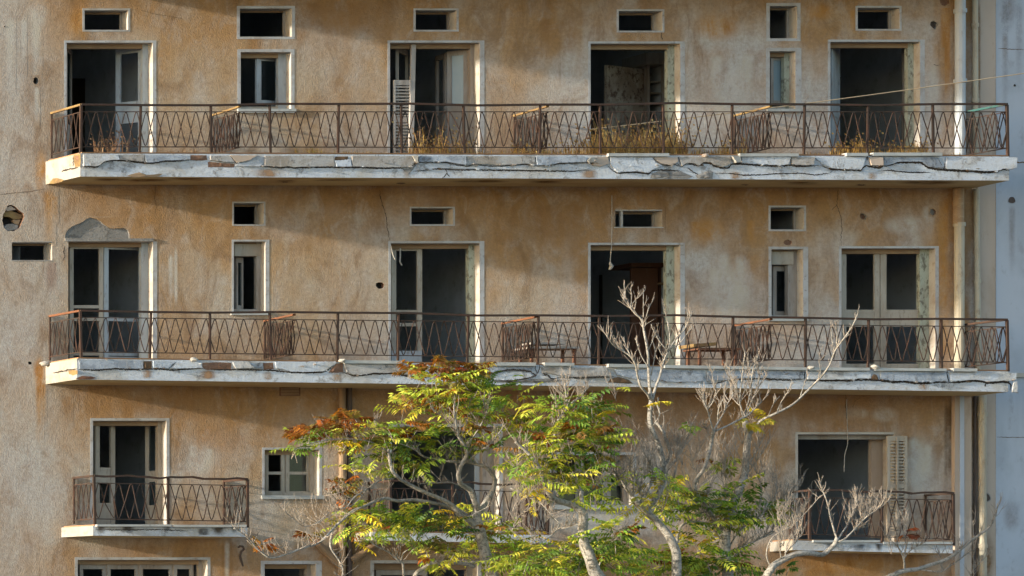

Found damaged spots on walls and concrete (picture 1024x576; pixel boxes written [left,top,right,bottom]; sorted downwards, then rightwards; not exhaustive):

crack [62,156,189,212]
peeling [74,154,1018,184]
crack [264,156,1024,246]
hole [2,205,24,231]
spalling [65,218,129,238]
crack [54,365,414,377]
crack [705,370,1012,419]